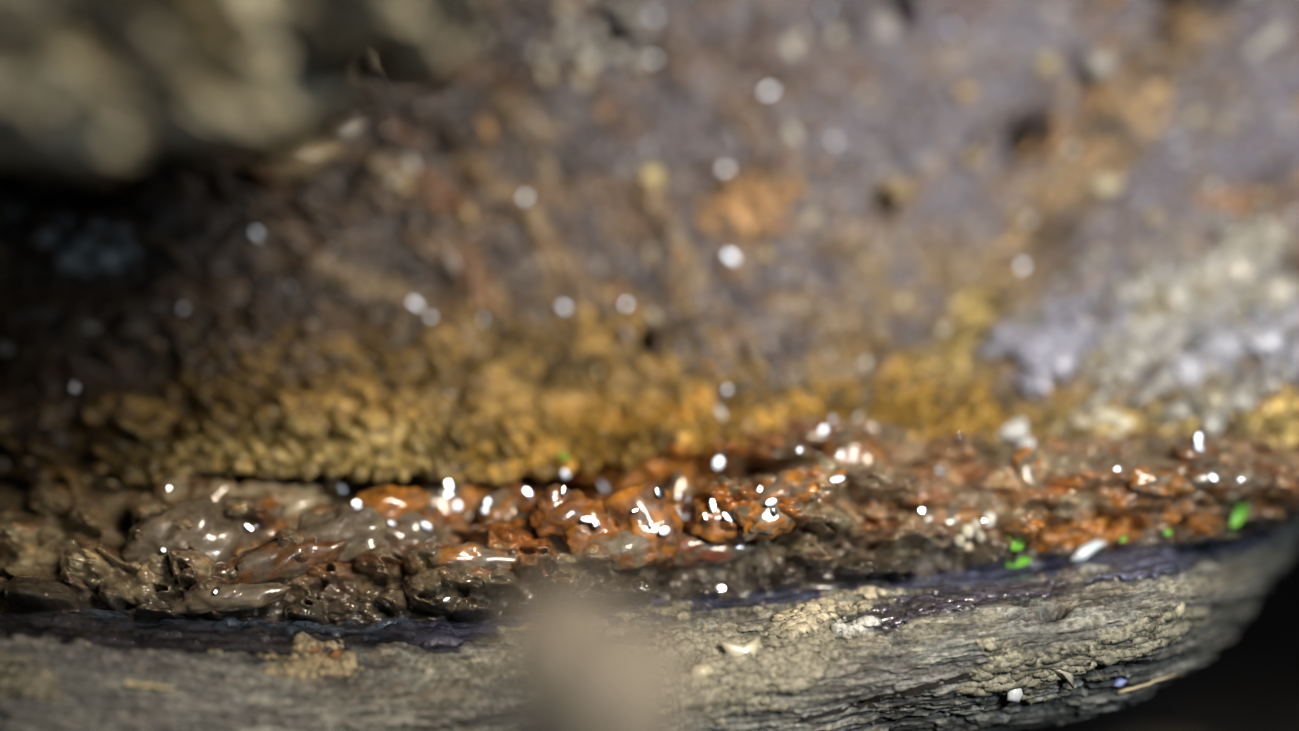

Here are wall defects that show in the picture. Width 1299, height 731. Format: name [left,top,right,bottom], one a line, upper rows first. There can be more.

rust [696,162,806,242]
rust [0,286,1299,624]